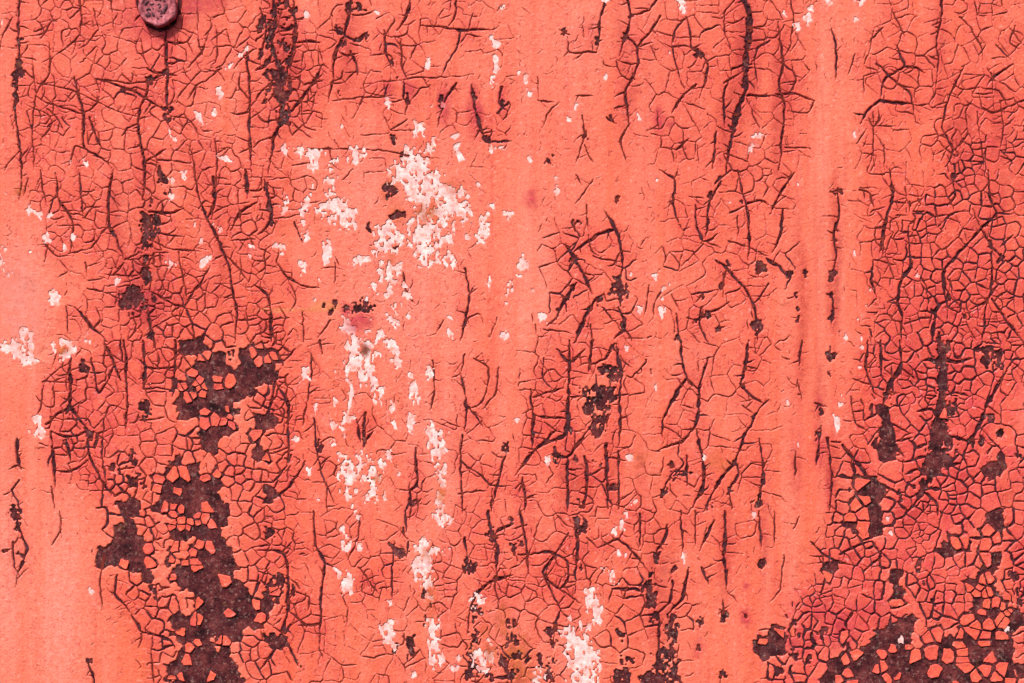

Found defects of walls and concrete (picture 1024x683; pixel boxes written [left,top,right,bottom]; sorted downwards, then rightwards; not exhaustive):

crack [4,439,29,585]
crack [92,550,175,681]
corrosion [96,334,296,683]
crack [0,0,527,545]
peeling [279,143,367,242]
peeling [330,119,514,527]
peeling [424,618,495,674]
peeling [557,587,603,683]
corrosion [580,364,624,439]
crack [258,0,1024,683]
corrosion [753,508,1024,683]
corrosion [842,338,1022,544]